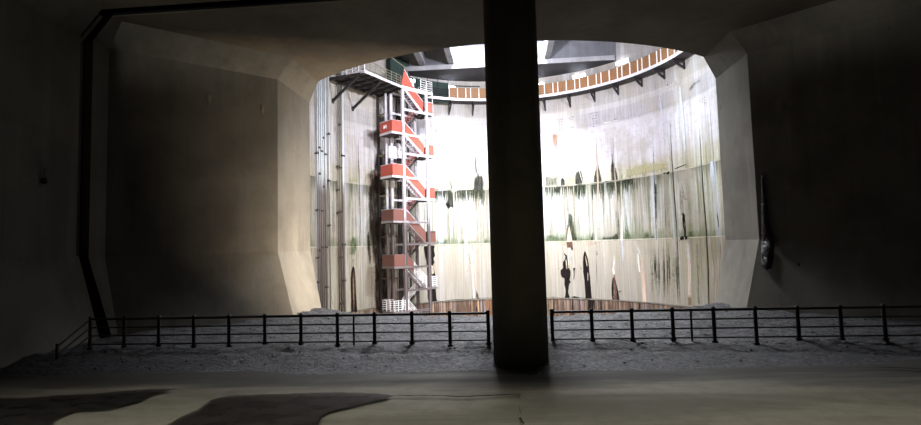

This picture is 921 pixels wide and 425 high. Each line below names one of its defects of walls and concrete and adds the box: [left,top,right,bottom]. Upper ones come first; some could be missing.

damp [367,152,388,311]
damp [435,154,485,208]
damp [545,143,635,254]